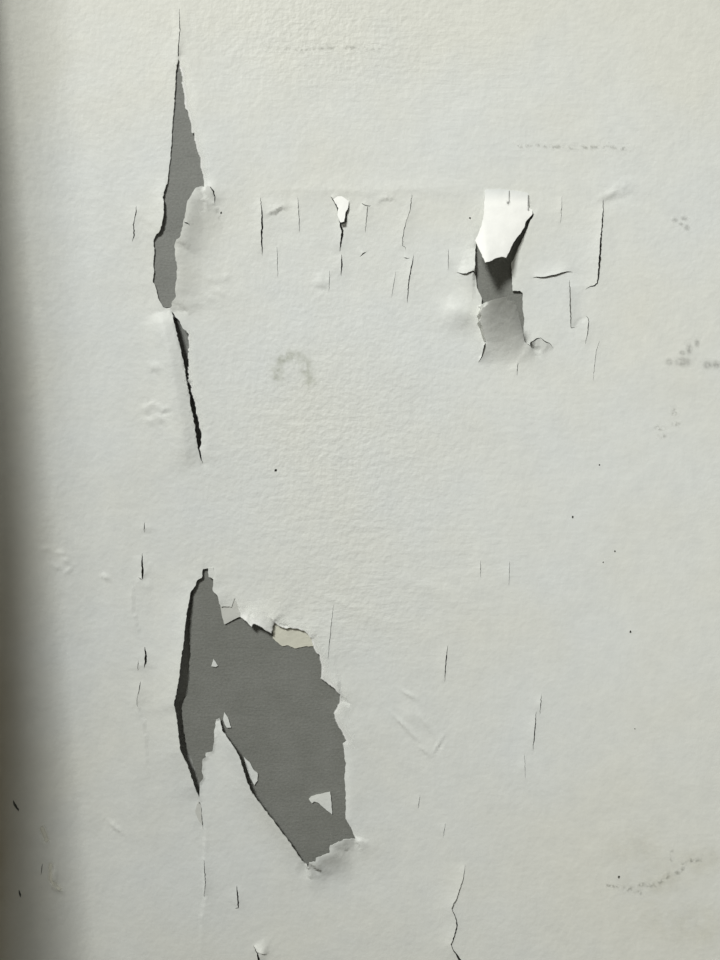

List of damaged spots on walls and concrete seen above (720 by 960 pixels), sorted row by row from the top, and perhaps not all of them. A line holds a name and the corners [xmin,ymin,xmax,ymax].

peeling [144,5,219,474]
peeling [327,193,355,281]
peeling [454,188,558,377]
crack [528,192,609,385]
peeling [165,558,365,960]
crack [446,859,471,960]